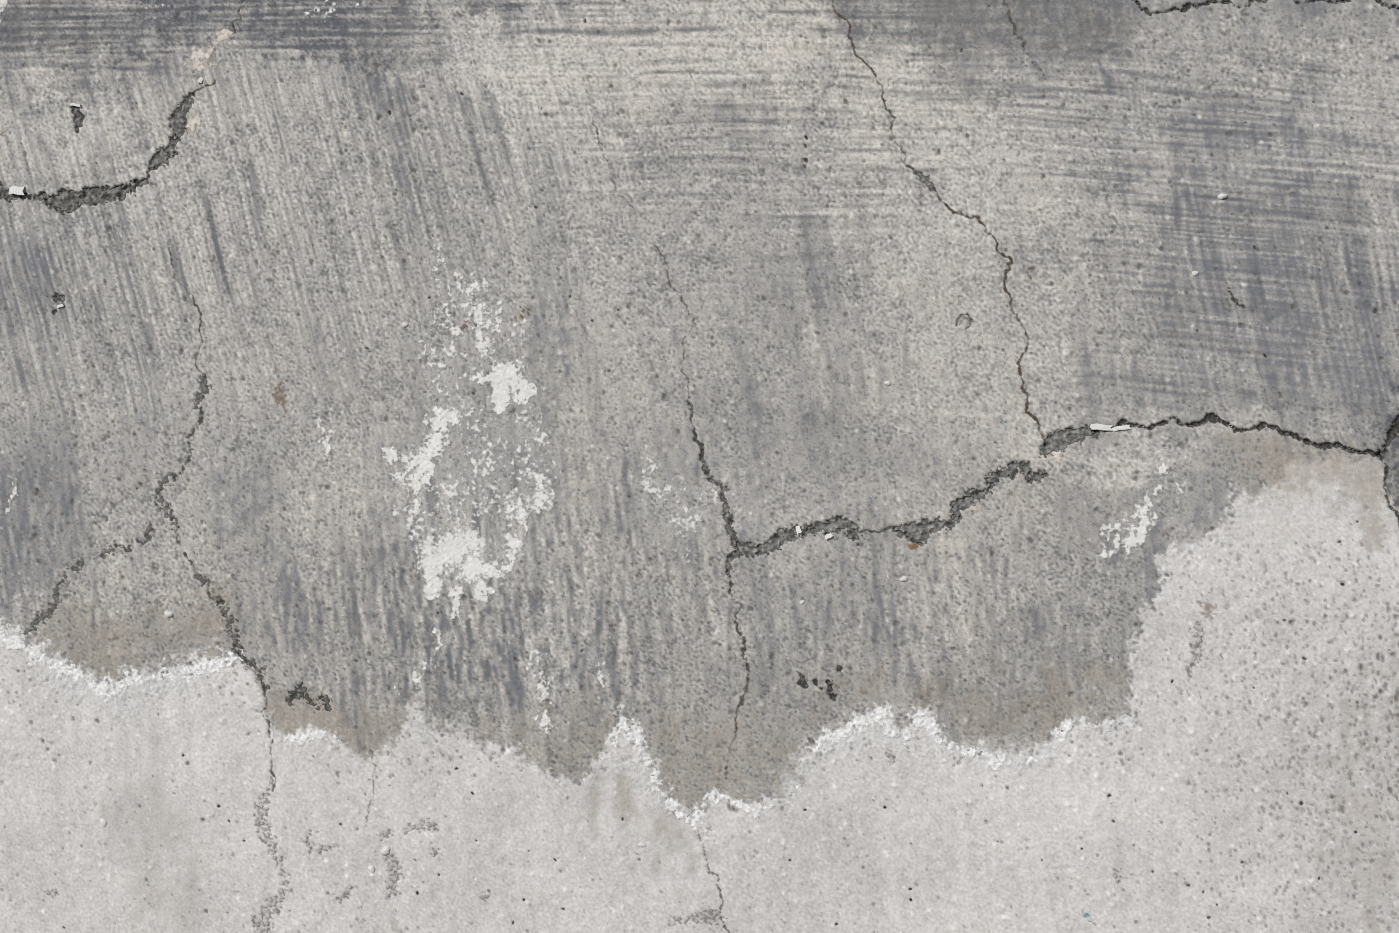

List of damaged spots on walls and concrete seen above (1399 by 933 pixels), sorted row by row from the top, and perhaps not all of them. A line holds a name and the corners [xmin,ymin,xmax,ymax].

crack [1135,0,1399,16]
crack [657,9,1399,732]
crack [20,252,275,791]
water stain [0,619,244,705]
water stain [269,730,339,755]
water stain [599,704,804,833]
water stain [805,705,1135,772]
crack [668,868,727,930]